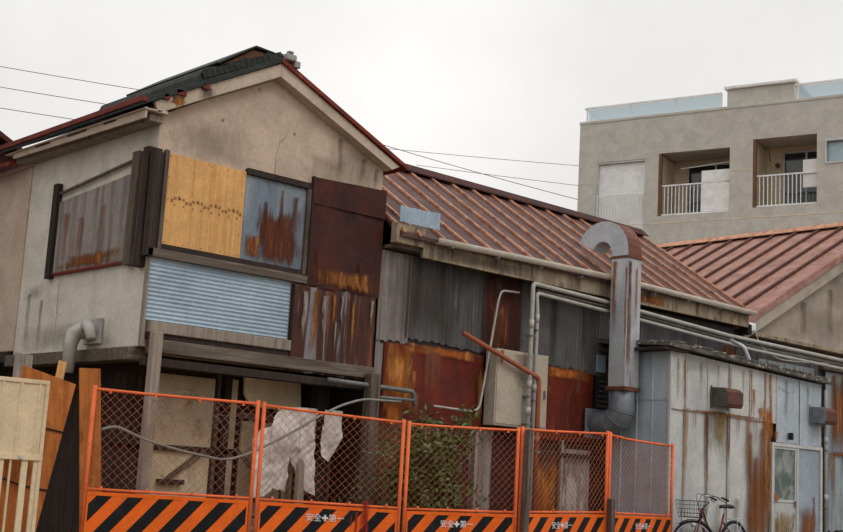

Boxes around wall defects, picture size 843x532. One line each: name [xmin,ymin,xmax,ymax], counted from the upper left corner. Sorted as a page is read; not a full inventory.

corrosion [61,247,119,270]
corrosion [245,191,301,266]
corrosion [308,177,387,345]
corrosion [385,343,472,424]
corrosion [550,367,588,382]
corrosion [683,371,815,532]
corrosion [831,375,843,480]